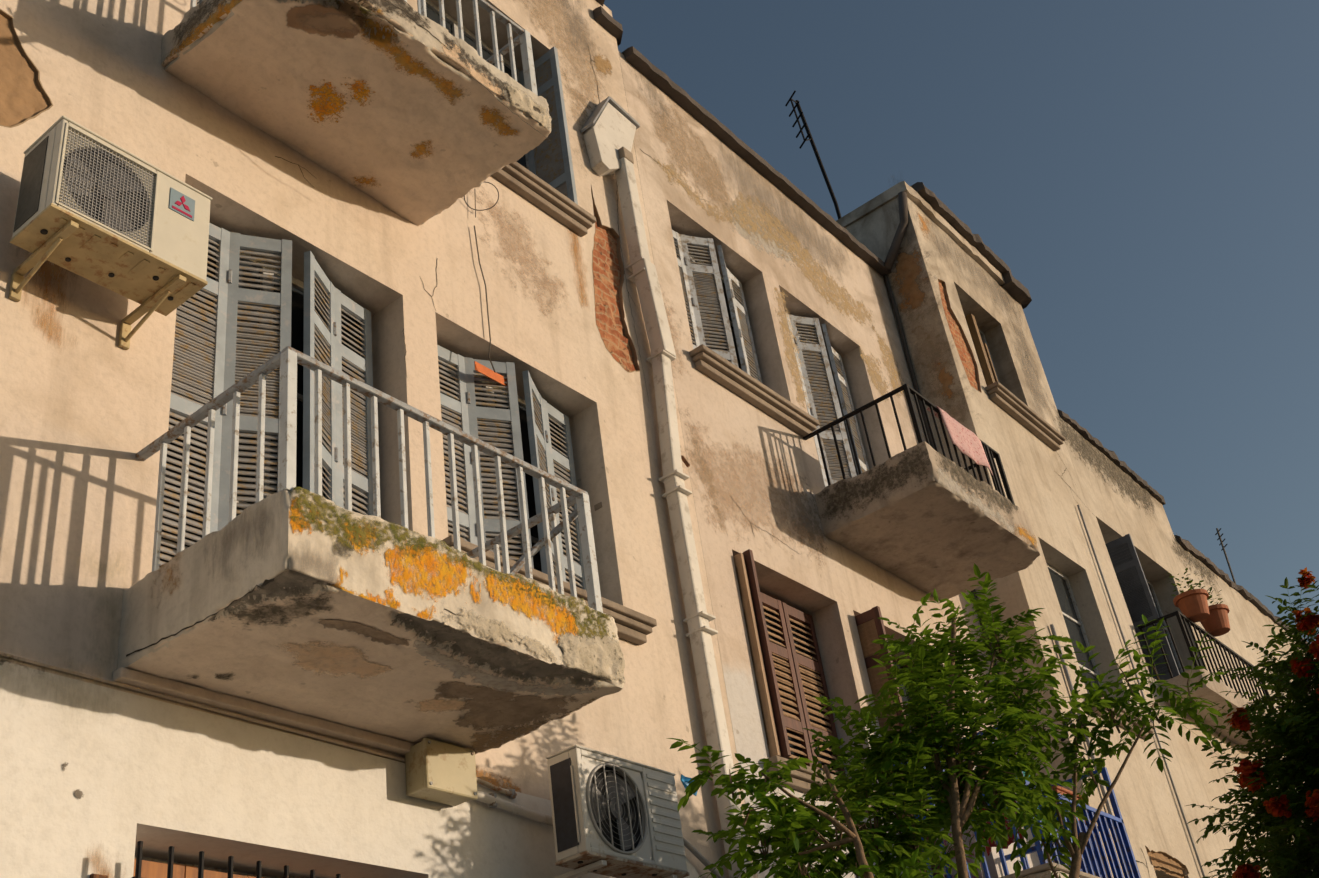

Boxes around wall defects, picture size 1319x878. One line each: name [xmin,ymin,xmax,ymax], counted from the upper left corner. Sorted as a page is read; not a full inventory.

spalling [0,9,53,128]
spalling [591,186,640,373]
peeling [894,248,982,399]
water stain [692,427,1018,539]
water stain [224,594,330,625]